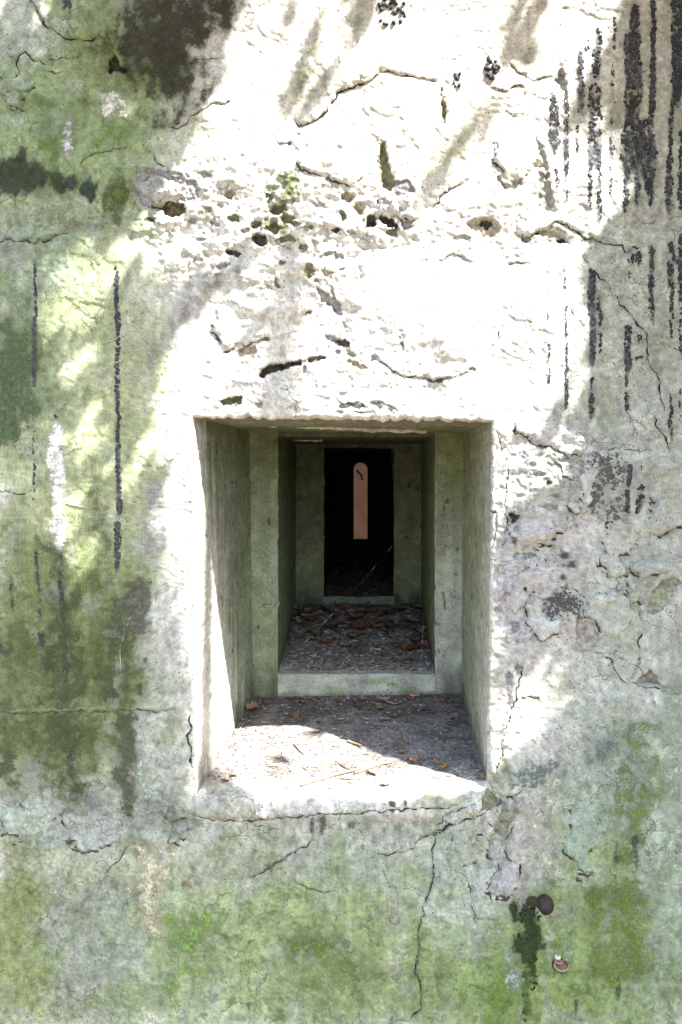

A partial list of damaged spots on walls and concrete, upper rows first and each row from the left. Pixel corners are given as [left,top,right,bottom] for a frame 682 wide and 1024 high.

leakage [101,0,255,139]
peeling [132,168,378,378]
peeling [288,130,416,237]
spalling [452,217,501,244]
crack [506,189,682,481]
leakage [587,268,604,419]
leakage [548,0,682,224]
leakage [623,234,682,412]
leakage [32,265,167,827]
spalling [491,416,597,645]
peeling [576,460,682,689]
crack [0,665,547,1024]